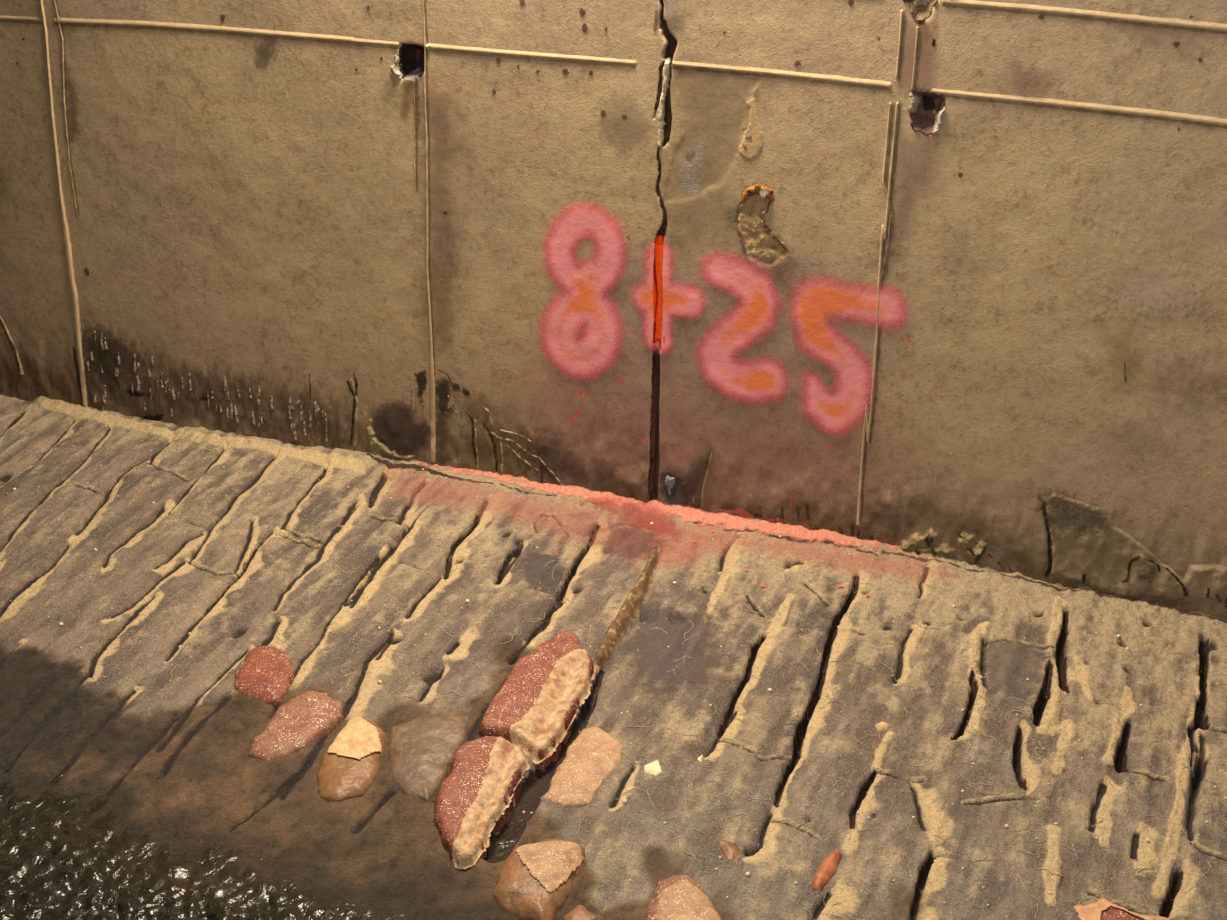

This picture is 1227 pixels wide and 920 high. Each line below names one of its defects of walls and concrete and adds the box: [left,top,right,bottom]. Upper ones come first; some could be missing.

spalling [380,42,425,120]
crack [653,0,677,243]
spalling [903,0,946,136]
spalling [734,183,790,265]
damp [366,370,470,463]
crack [347,374,557,580]
crack [560,347,660,601]
crack [484,544,659,864]
crack [693,503,1227,808]
crack [851,770,877,829]
crack [911,857,934,920]
crack [1161,871,1183,918]